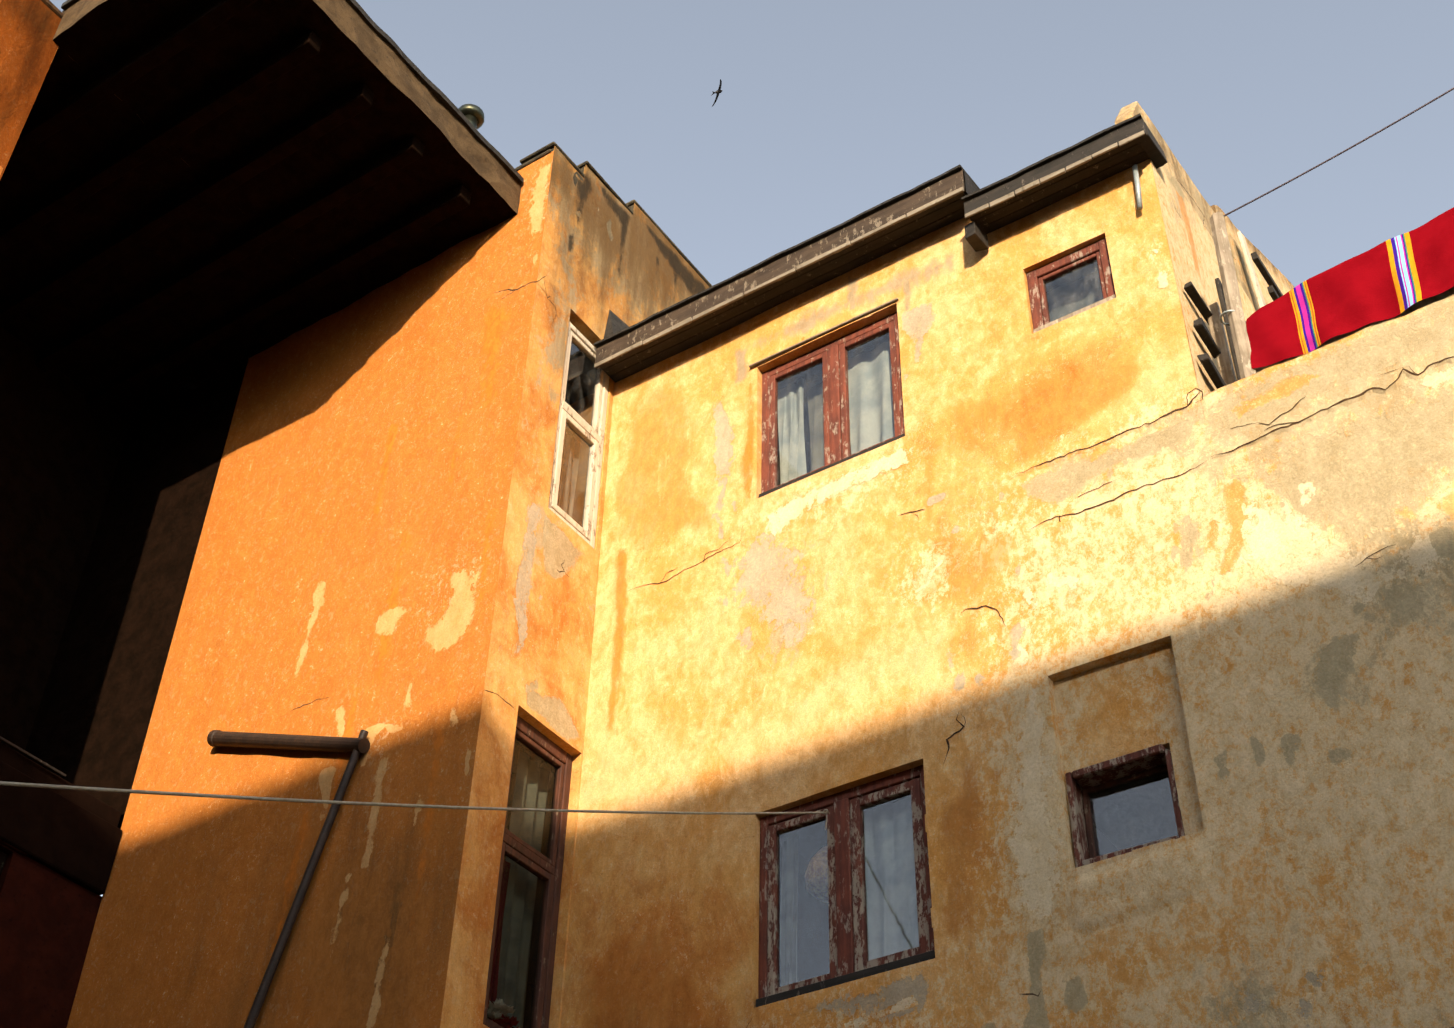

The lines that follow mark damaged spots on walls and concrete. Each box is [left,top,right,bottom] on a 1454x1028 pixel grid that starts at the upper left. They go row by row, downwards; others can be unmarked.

flaking render [1021,301,1454,507]
crack [1011,356,1454,529]
flaking render [542,515,583,582]
crack [631,527,743,590]
flaking render [711,397,821,655]
flaking render [1171,514,1221,575]
flaking render [1392,491,1454,569]
peeling [372,606,410,637]
flaking render [1312,569,1454,709]
crack [944,712,966,762]
flaking render [1247,733,1302,770]
flaking render [764,968,936,1028]